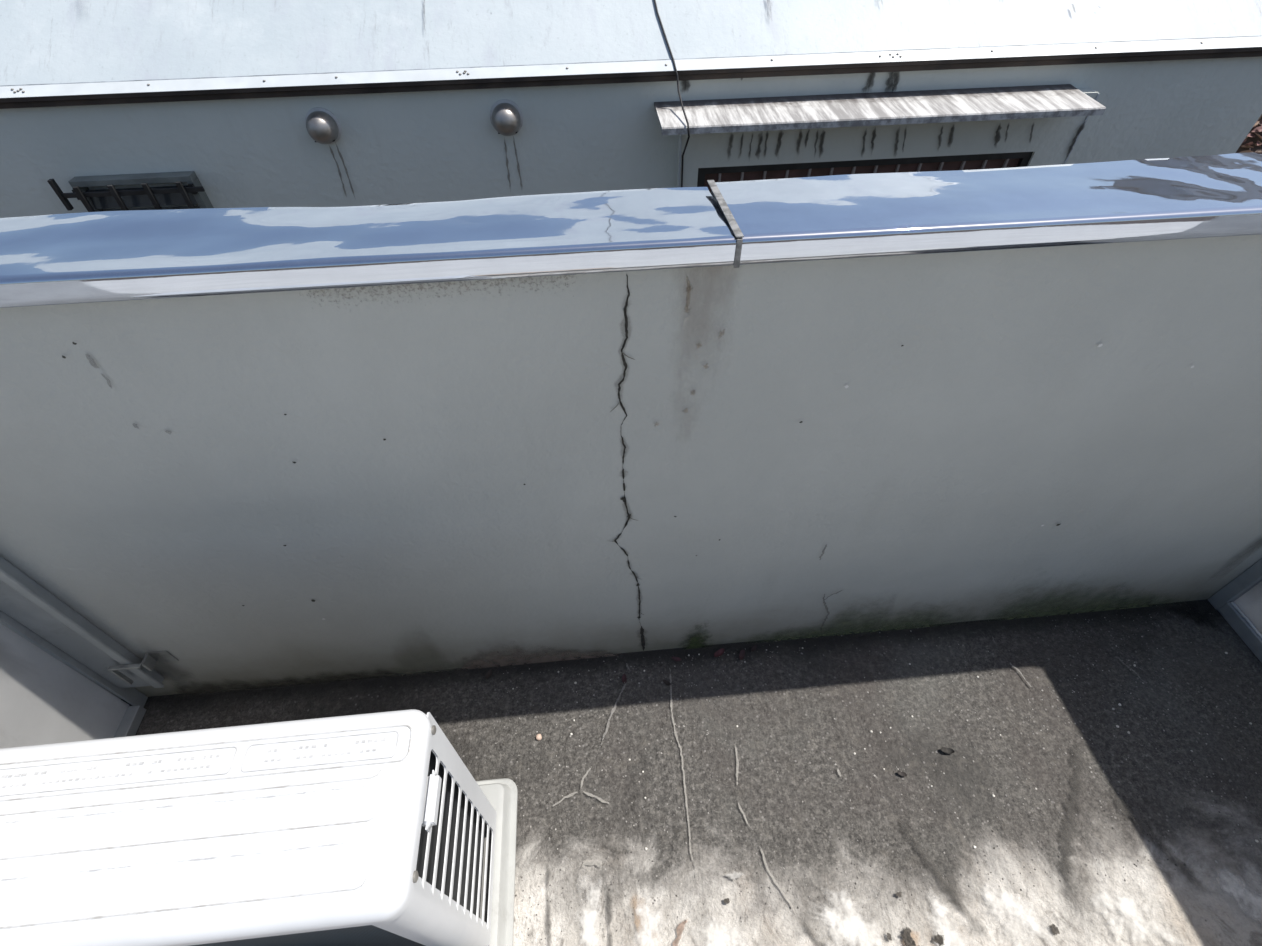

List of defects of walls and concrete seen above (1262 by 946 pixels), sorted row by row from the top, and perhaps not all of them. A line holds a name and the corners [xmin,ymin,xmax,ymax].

damp [863,72,899,91]
damp [728,131,783,156]
damp [797,130,825,155]
crack [552,274,645,806]
crack [669,668,697,876]
crack [673,920,688,946]